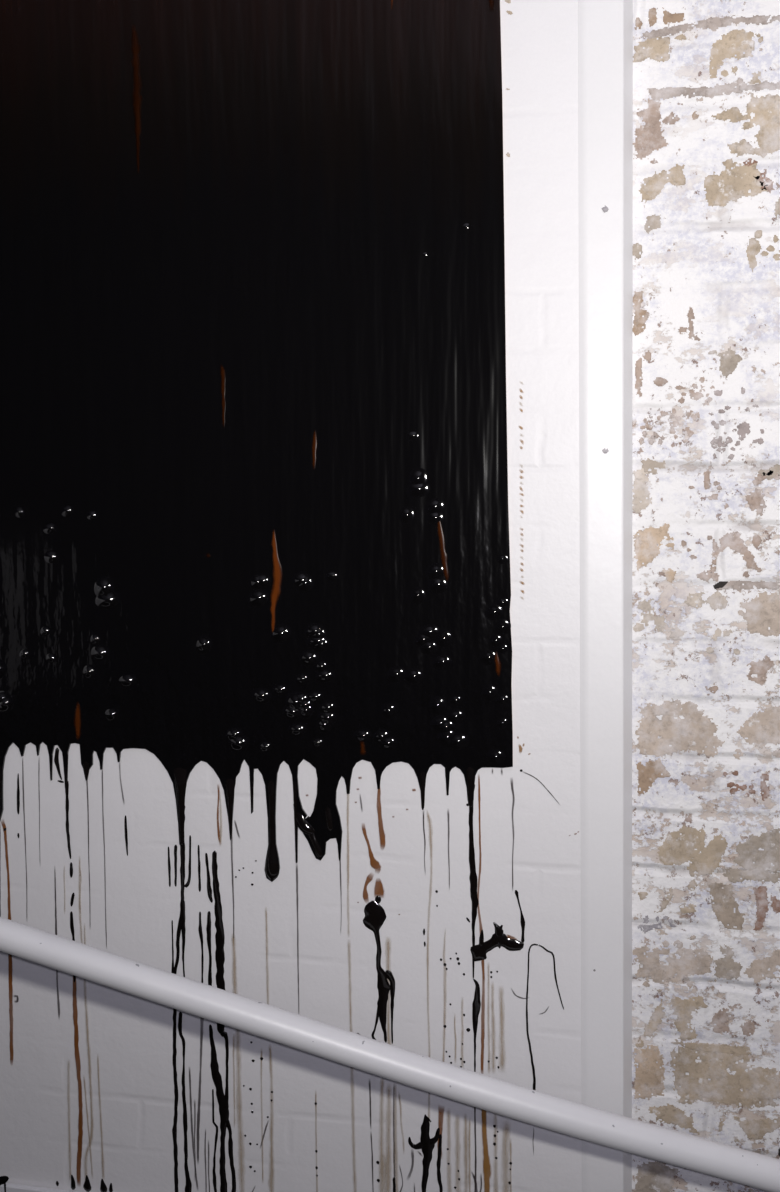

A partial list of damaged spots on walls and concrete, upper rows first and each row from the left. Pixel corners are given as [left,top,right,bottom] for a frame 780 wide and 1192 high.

peeling [632,7,780,260]
peeling [746,230,780,272]
peeling [632,288,649,336]
peeling [679,308,701,341]
peeling [632,346,764,514]
peeling [745,464,780,516]
peeling [633,523,780,654]
peeling [733,648,773,687]
peeling [635,698,780,801]
peeling [632,825,780,1145]
peeling [634,1159,685,1192]